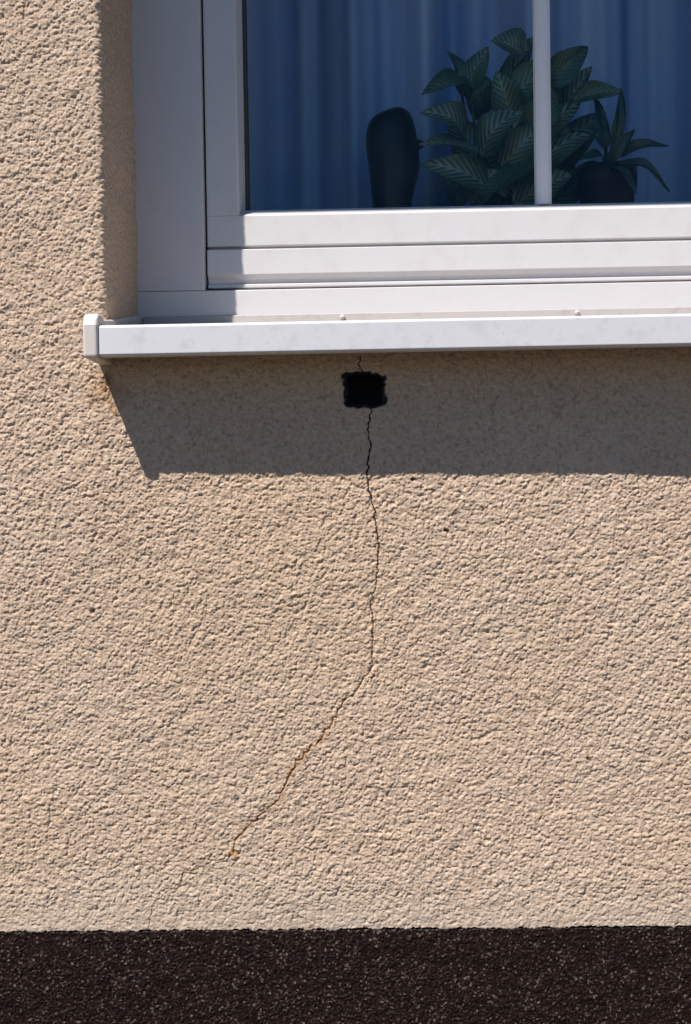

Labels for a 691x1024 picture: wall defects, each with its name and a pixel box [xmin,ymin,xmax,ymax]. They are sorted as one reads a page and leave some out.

crack [148,406,380,927]